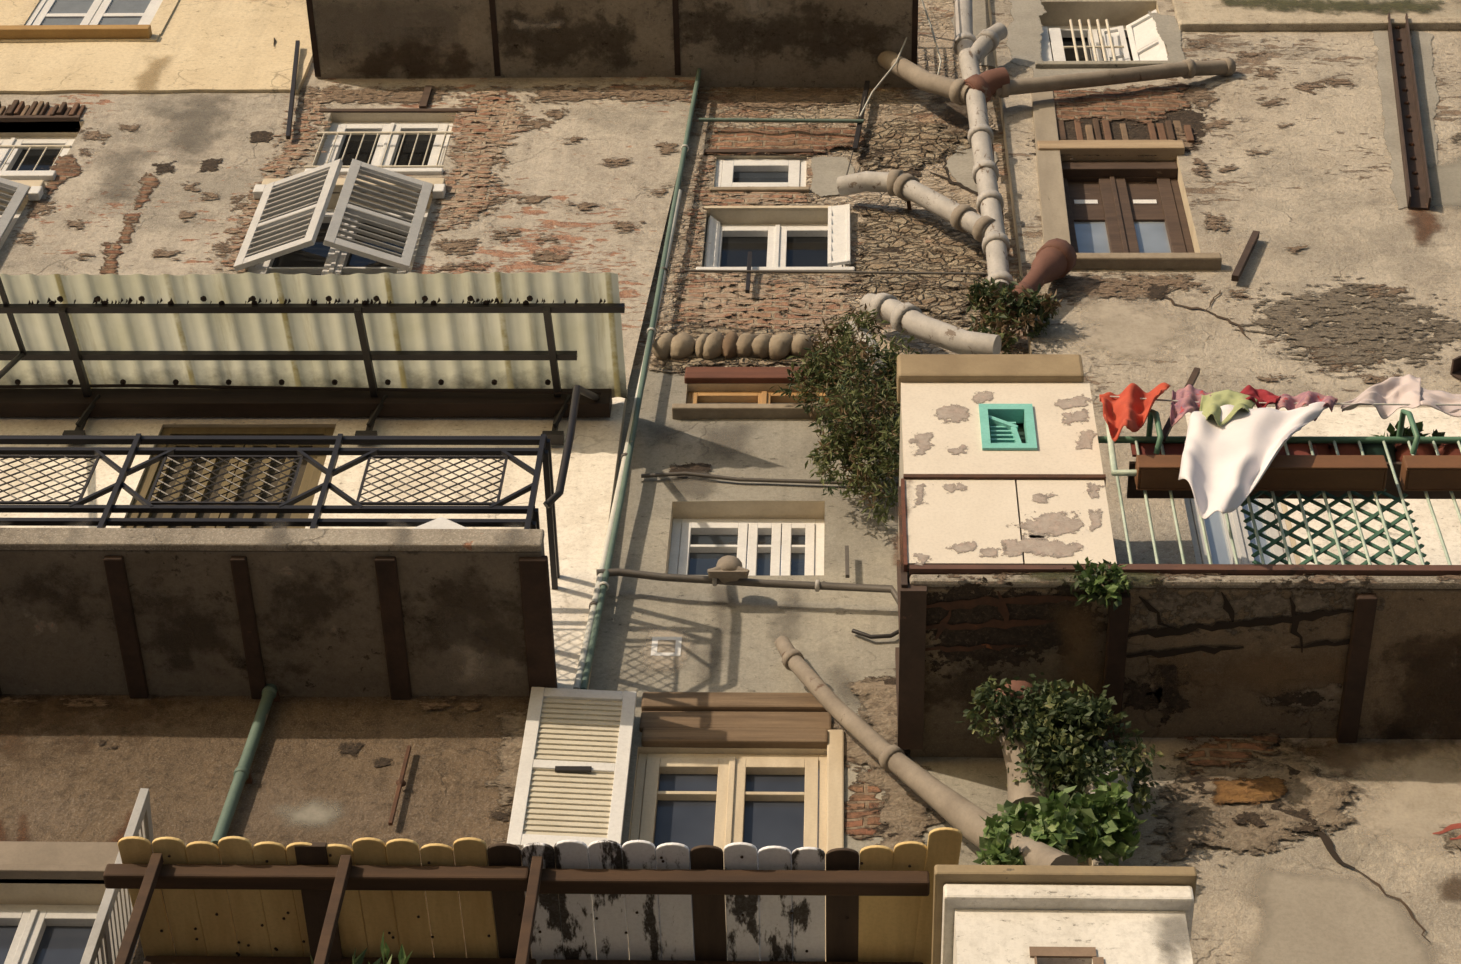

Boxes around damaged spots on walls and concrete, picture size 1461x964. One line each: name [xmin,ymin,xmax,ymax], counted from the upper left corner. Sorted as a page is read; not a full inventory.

water stain [316,4,473,78]
water stain [499,8,634,67]
water stain [679,0,893,58]
flaking render [10,122,141,246]
flaking render [70,79,866,337]
flaking render [1048,269,1461,384]
peeling [908,391,993,456]
peeling [913,482,1105,586]
water stain [1277,635,1461,776]
flaking render [844,755,901,840]
spalling [1123,664,1369,867]
crack [1307,825,1431,943]